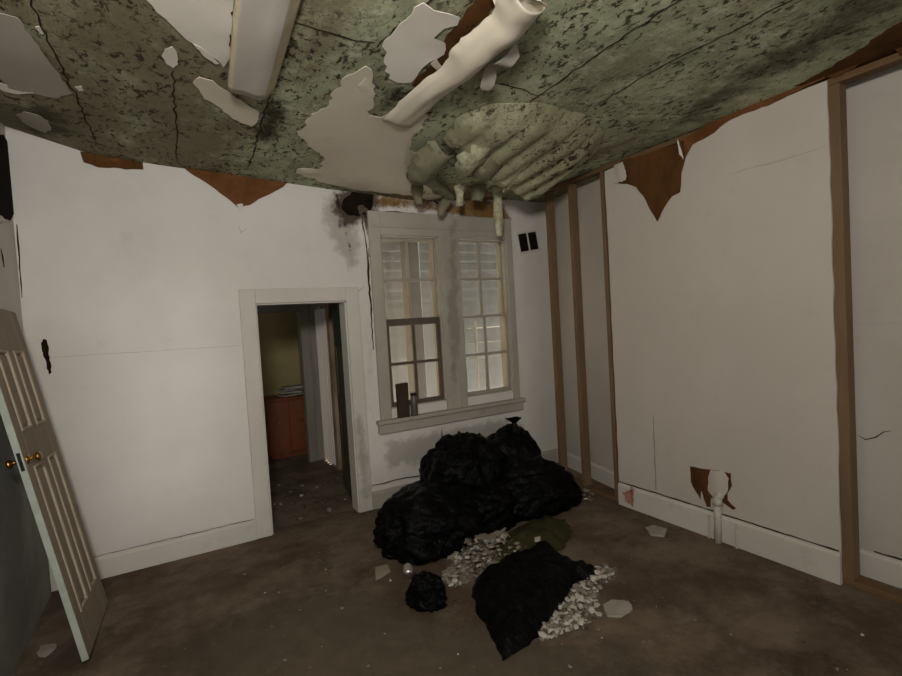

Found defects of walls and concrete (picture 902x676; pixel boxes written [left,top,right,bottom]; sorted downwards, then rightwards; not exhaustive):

spalling [0,134,14,222]
peeling [0,13,84,99]
crack [30,0,98,144]
spalling [80,151,143,170]
crack [170,71,178,162]
peeling [147,0,234,68]
peeling [193,77,259,127]
spalling [185,168,287,212]
mould [256,101,290,141]
peeling [295,0,548,236]
spalling [614,22,902,222]
mould [685,0,896,121]